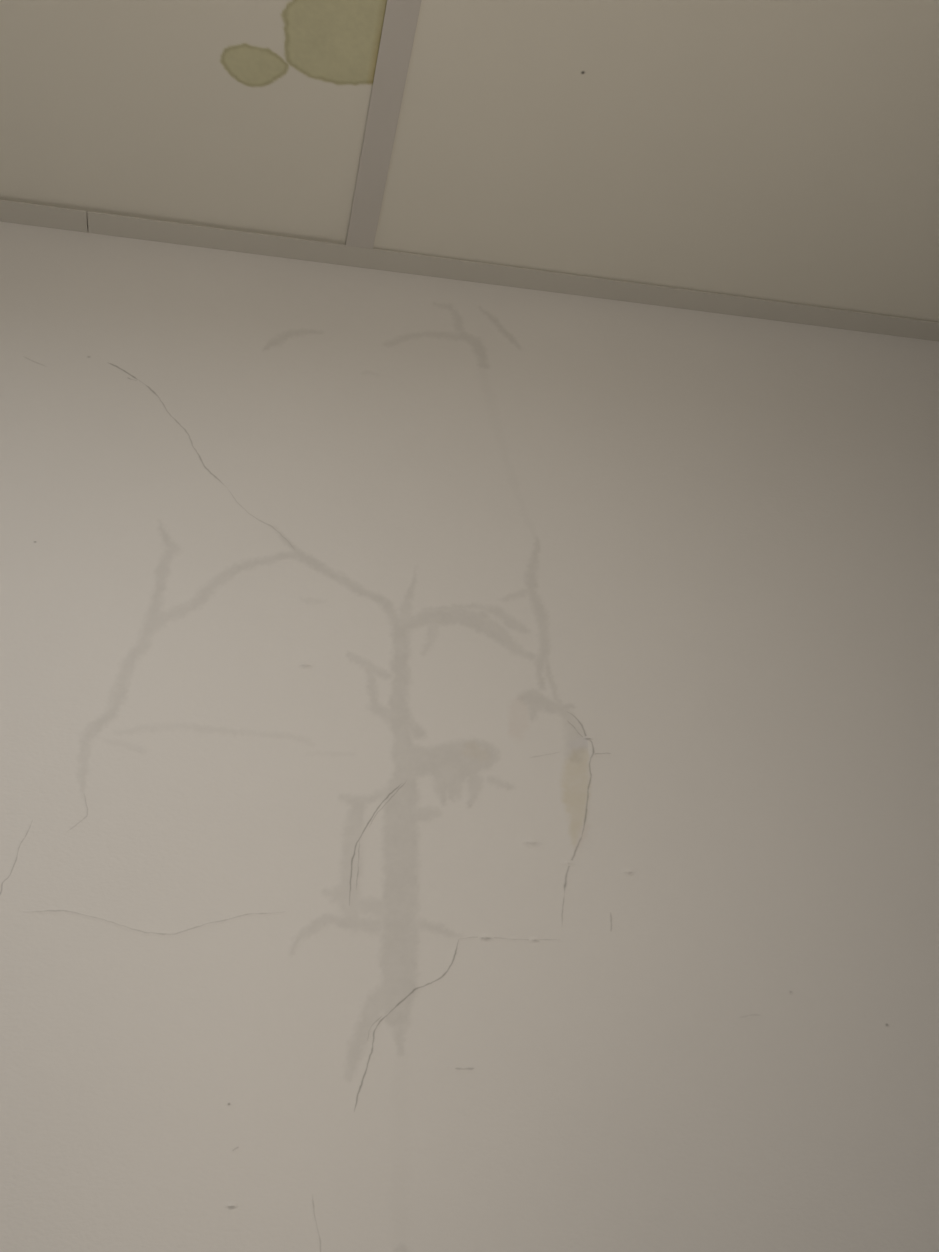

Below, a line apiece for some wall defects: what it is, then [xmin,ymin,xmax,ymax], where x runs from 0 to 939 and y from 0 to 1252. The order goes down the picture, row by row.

water stain [217,0,387,92]
crack [107,362,296,551]
water stain [74,516,587,1252]
crack [347,710,612,1112]